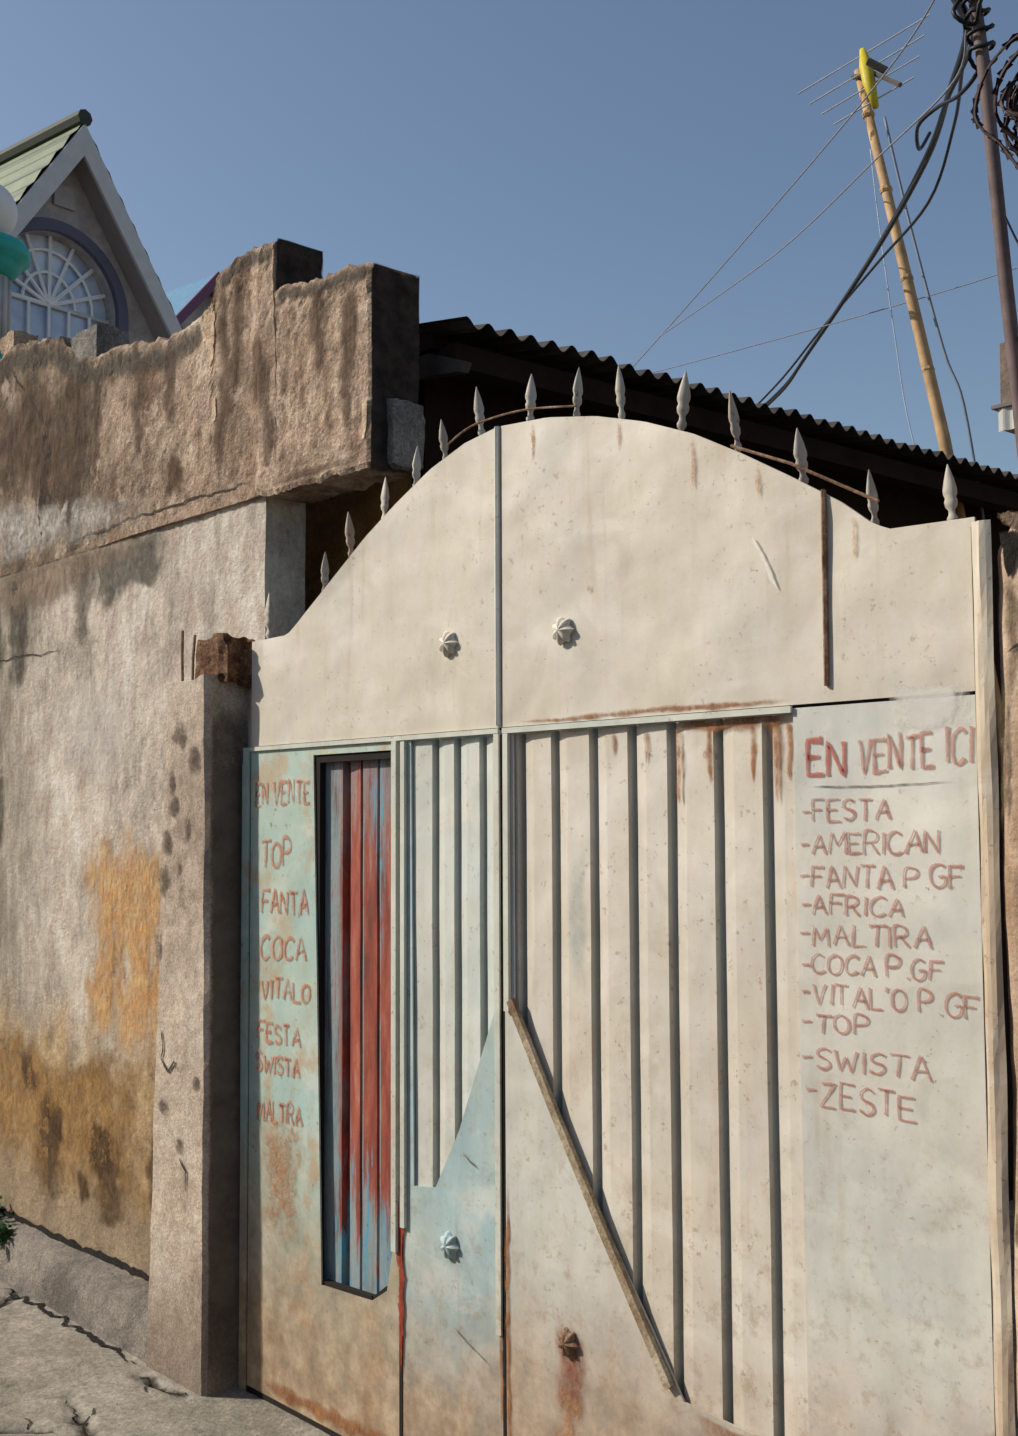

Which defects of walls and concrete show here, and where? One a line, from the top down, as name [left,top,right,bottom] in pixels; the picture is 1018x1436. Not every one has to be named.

damp [215,238,420,475]
damp [0,327,201,522]
crack [12,371,249,602]
spalling [181,630,255,689]
corrosion [533,701,793,802]
damp [159,772,190,894]
damp [0,1037,153,1225]
crack [4,1288,150,1392]
corrosion [272,1385,378,1436]